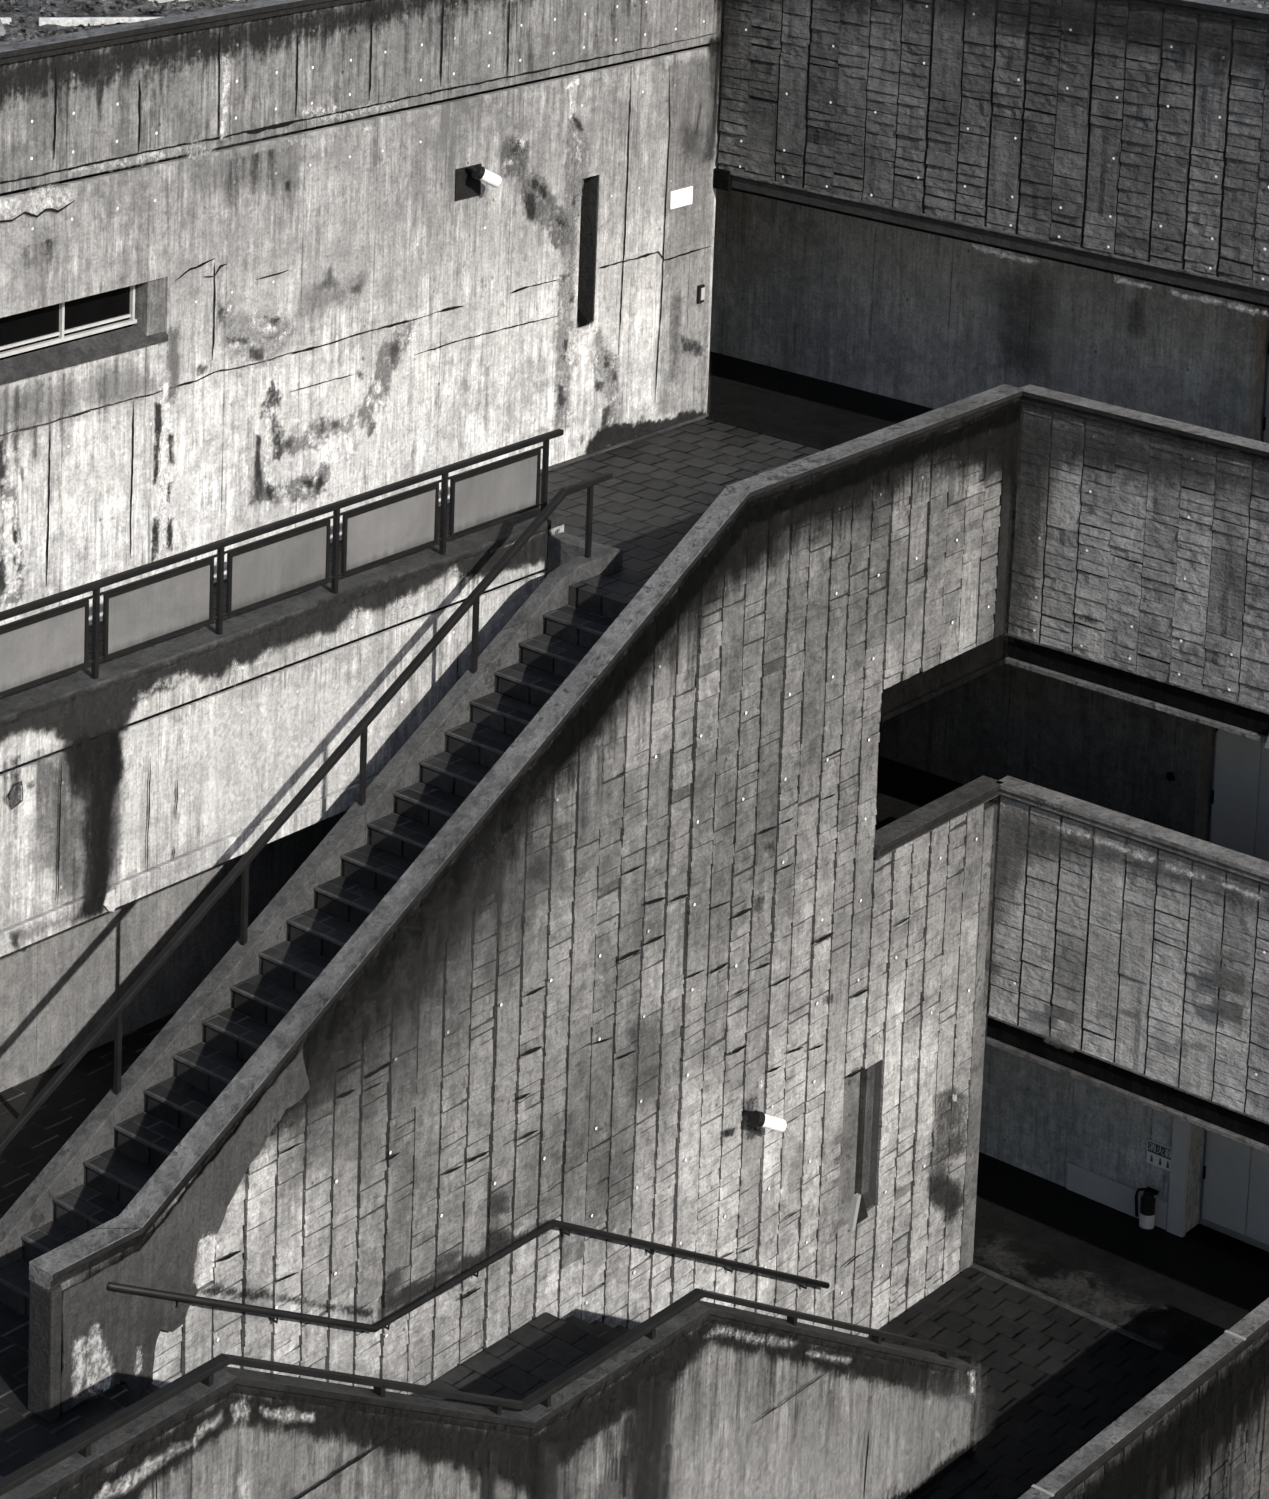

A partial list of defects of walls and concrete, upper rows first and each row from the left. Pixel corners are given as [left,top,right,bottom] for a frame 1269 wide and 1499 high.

leakage [0,0,523,109]
leakage [900,0,1269,91]
spalling [0,187,75,222]
leakage [674,297,702,364]
crack [0,258,559,586]
leakage [0,400,1269,1283]
flaking render [60,1049,310,1413]
leakage [53,1316,978,1499]
leakage [1069,1337,1269,1499]